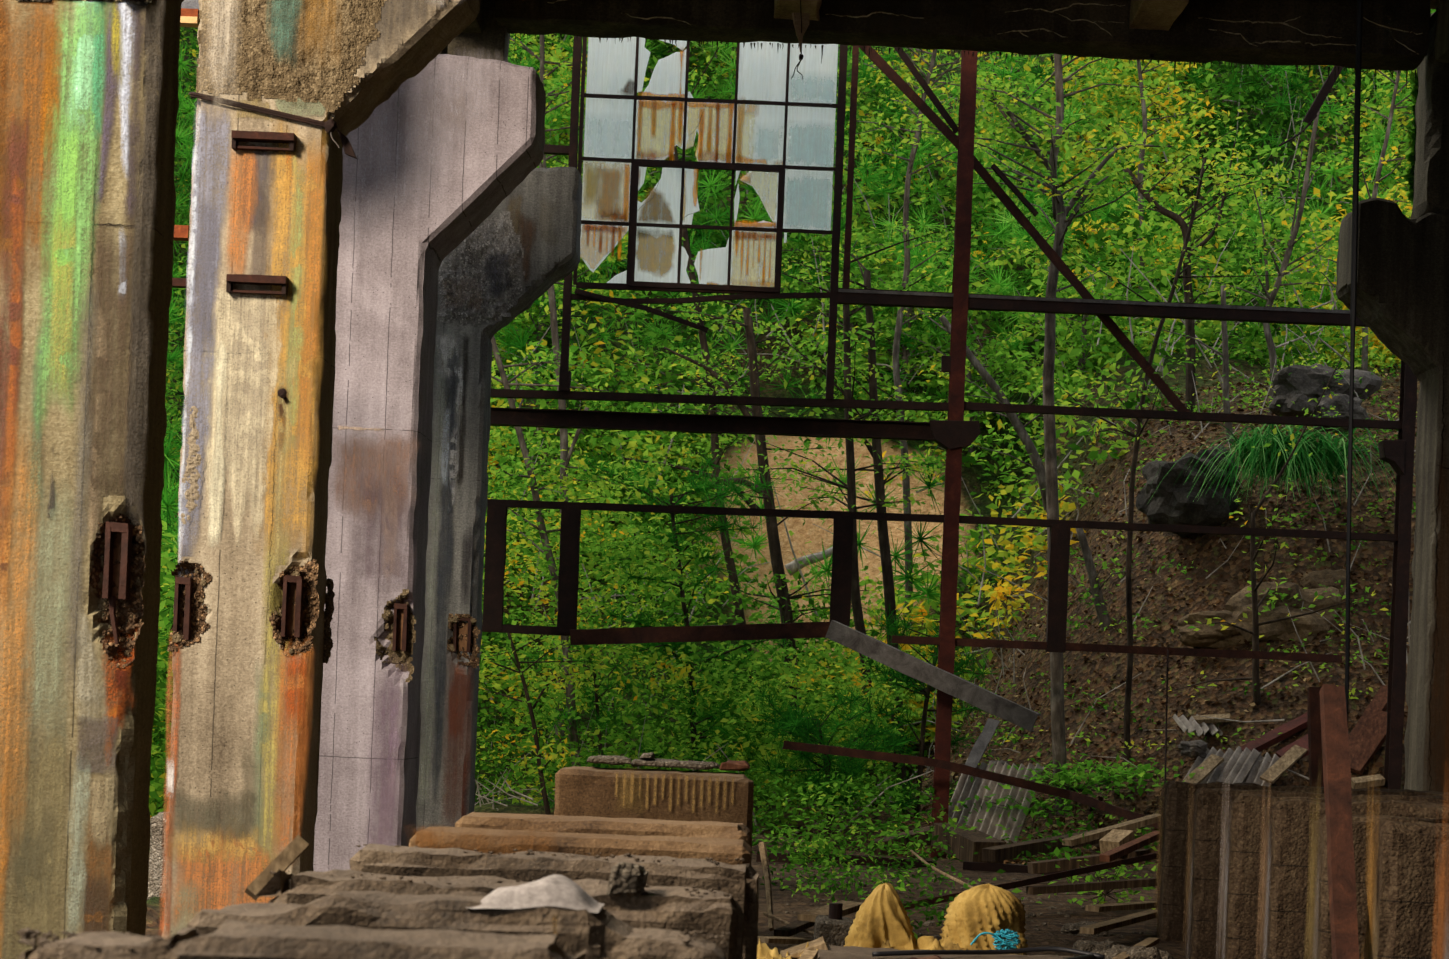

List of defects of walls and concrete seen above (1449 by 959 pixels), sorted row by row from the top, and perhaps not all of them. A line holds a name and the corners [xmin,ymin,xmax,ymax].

leakage [213,0,231,64]
leakage [271,0,334,54]
crack [999,3,1125,37]
crack [1206,16,1422,54]
rust [229,131,323,564]
leakage [7,0,163,957]
spalling [89,513,146,668]
spalling [167,561,211,652]
spalling [269,559,335,664]
spalling [374,589,416,682]
rust [105,648,134,761]
rust [83,794,111,932]